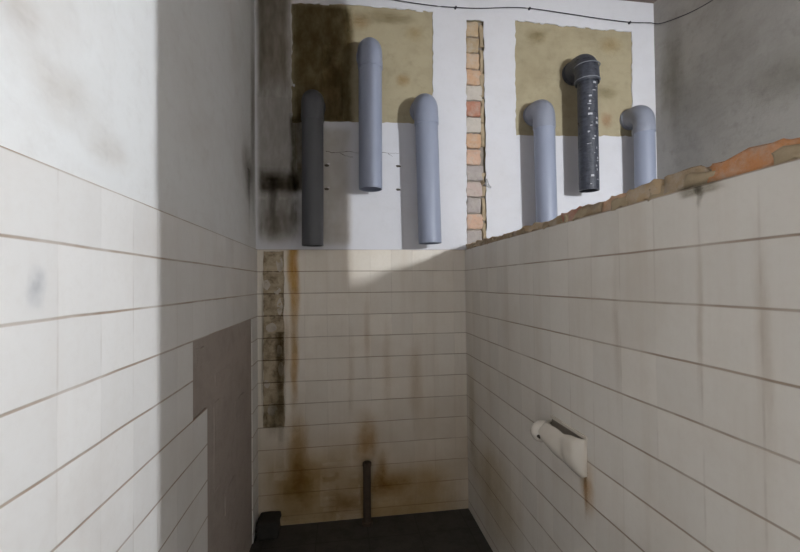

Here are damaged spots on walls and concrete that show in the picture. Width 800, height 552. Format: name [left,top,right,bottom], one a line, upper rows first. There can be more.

damp [262,120,302,190]
spalling [466,20,800,249]
spalling [263,251,285,428]